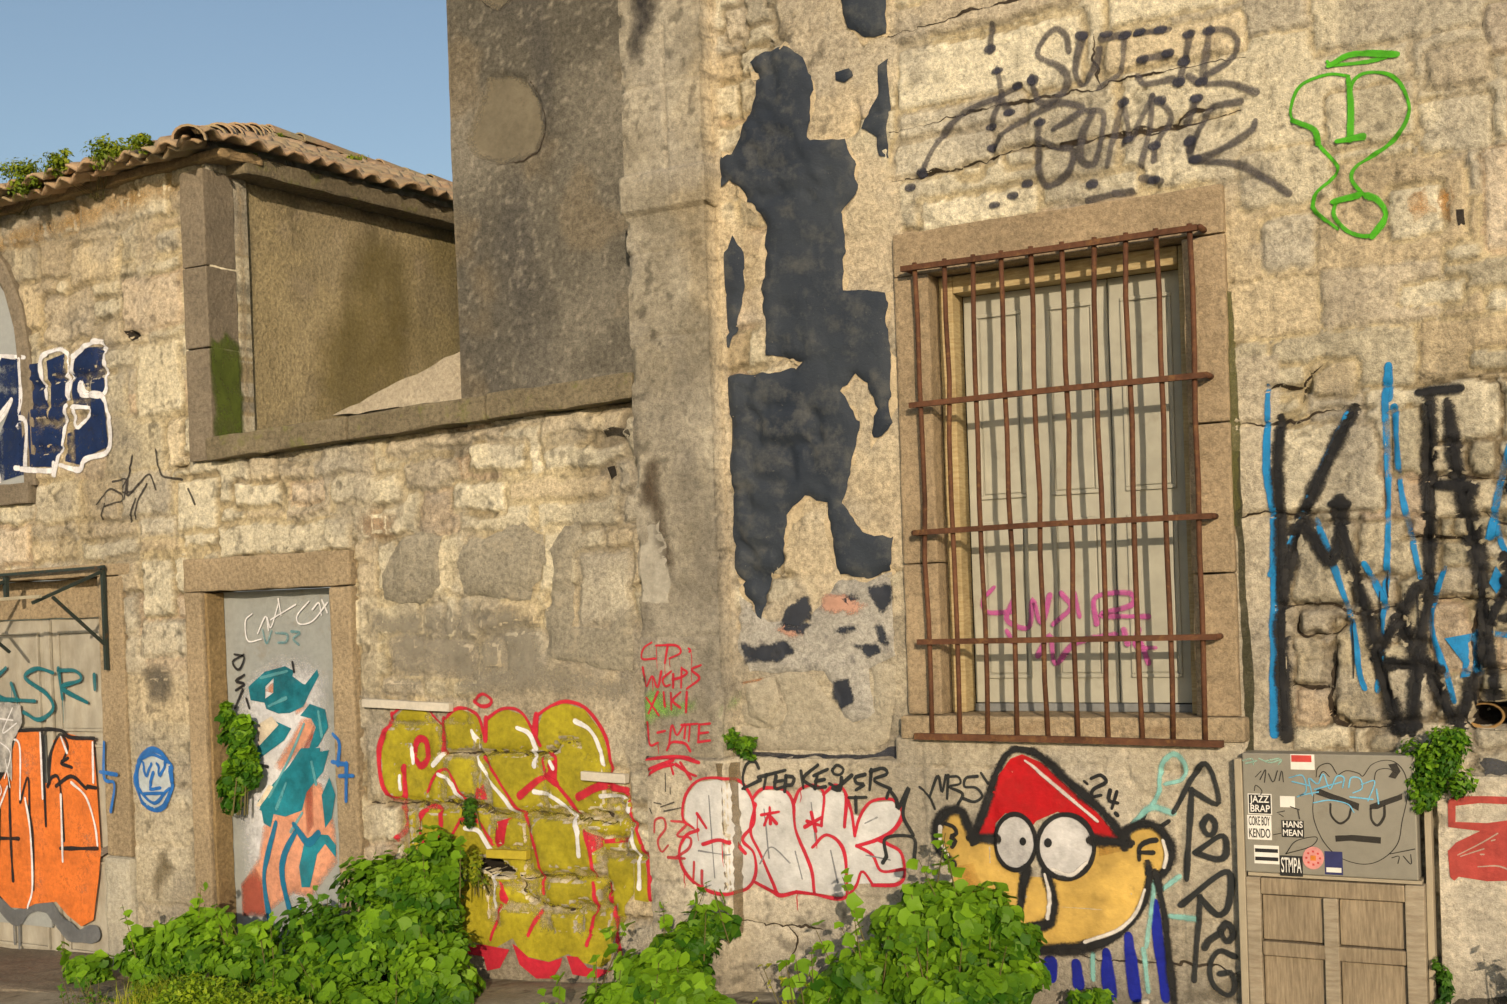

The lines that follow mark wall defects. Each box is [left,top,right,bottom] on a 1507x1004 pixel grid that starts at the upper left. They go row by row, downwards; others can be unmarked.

peeling [841,0,890,47]
crack [888,0,1018,37]
peeling [720,41,899,752]